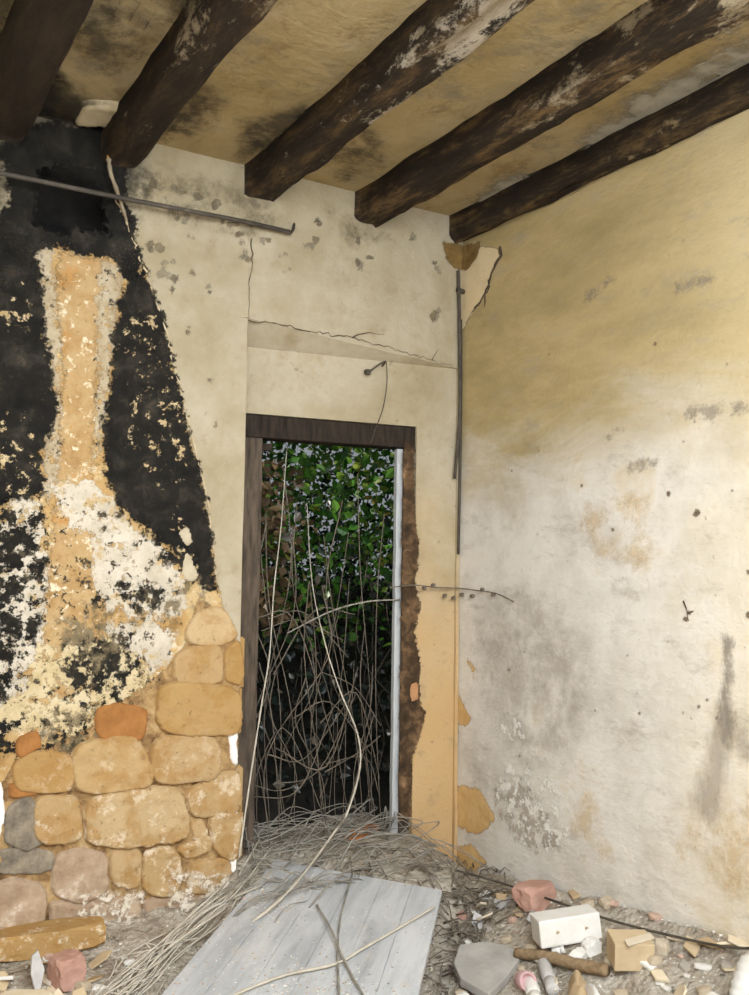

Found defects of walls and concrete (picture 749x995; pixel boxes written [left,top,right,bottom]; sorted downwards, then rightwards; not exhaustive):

leakage [0,75,225,593]
peeling [145,177,222,210]
peeling [221,220,251,262]
crack [248,238,453,366]
peeling [432,241,499,329]
spalling [0,200,226,783]
spalling [397,440,426,824]
peeling [458,696,471,727]
leakage [720,638,733,742]
peeling [457,755,572,871]
leakage [494,780,558,849]